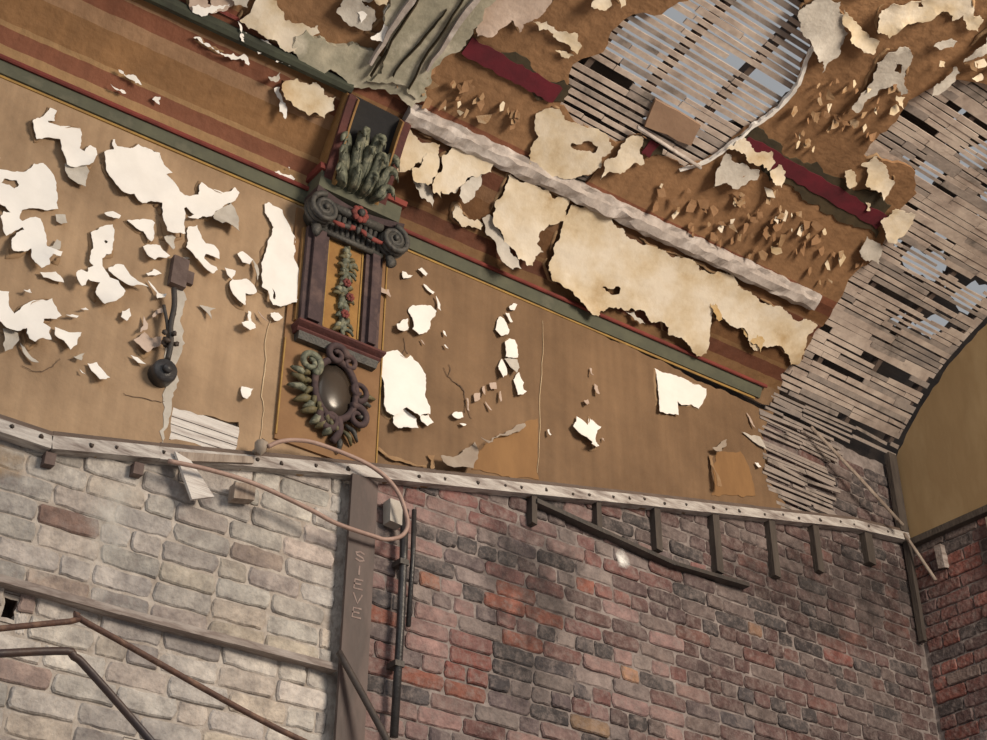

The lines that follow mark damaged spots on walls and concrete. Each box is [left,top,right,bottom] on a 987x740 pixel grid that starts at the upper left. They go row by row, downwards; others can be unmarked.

peeling [186,0,335,119]
peeling [336,0,390,42]
peeling [528,105,645,180]
peeling [591,0,627,11]
peeling [791,0,987,200]
peeling [0,107,299,441]
peeling [397,130,818,365]
peeling [652,138,916,285]
peeling [380,350,434,428]
peeling [452,303,527,426]
peeling [573,368,604,452]
peeling [653,368,706,417]